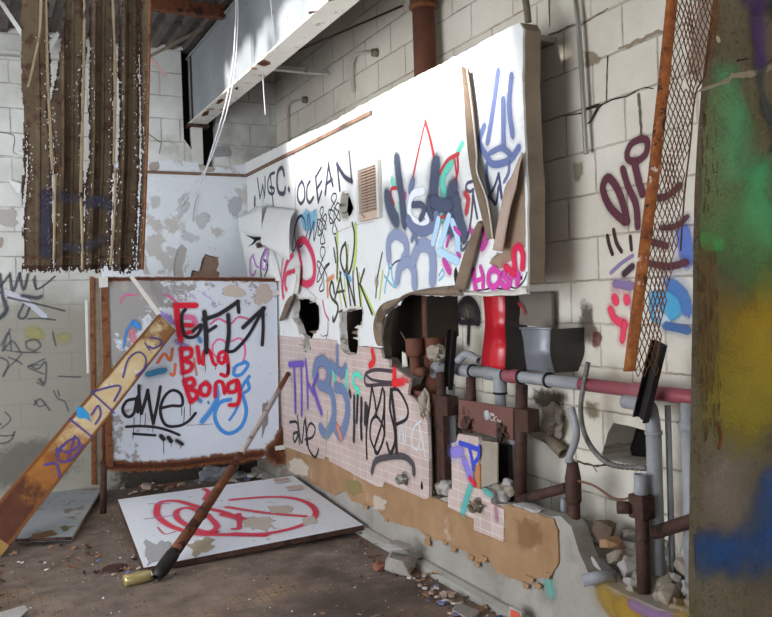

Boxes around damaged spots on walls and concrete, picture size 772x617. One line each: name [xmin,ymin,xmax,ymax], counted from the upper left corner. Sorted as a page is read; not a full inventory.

crack [562,29,663,135]
peeling [212,146,231,157]
spalling [285,447,560,590]
peeling [144,540,171,565]
peeling [187,537,215,557]